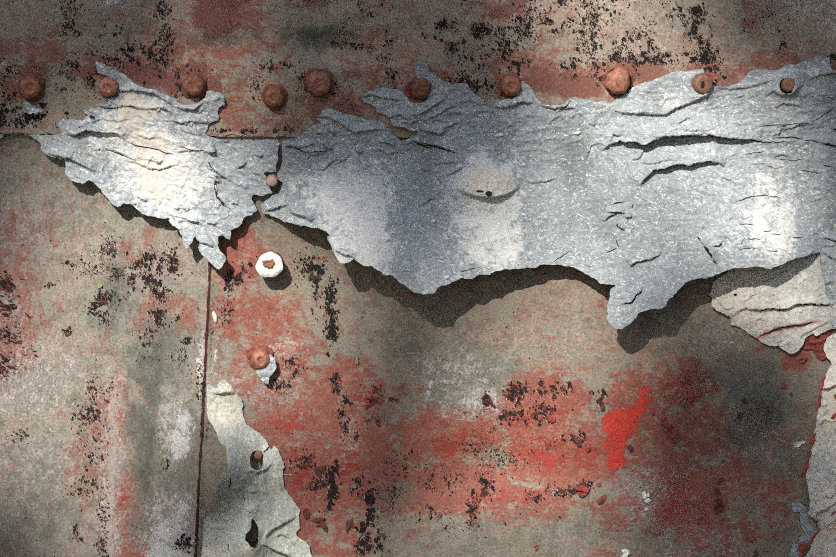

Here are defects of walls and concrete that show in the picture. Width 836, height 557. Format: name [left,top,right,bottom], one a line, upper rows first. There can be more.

rust [0,44,58,128]
rust [46,0,213,119]
peeling [0,61,289,270]
rust [417,0,729,95]
rust [0,270,42,380]
rust [60,231,214,411]
rust [196,255,275,332]
rust [287,247,341,357]
peeling [261,57,836,557]
rust [58,376,130,557]
peeling [201,379,327,557]
rust [286,367,601,557]